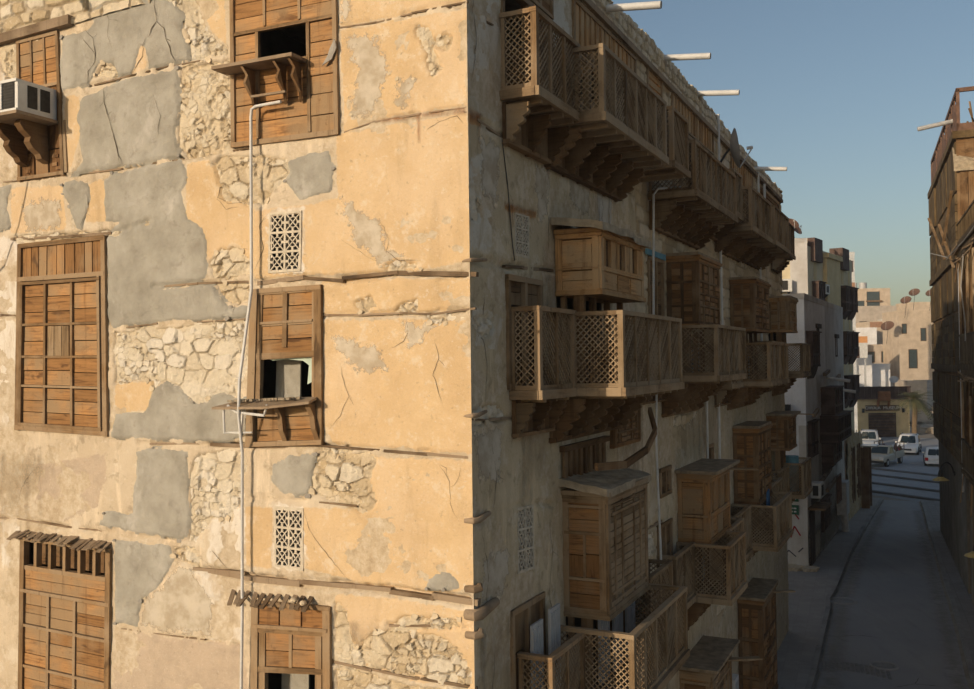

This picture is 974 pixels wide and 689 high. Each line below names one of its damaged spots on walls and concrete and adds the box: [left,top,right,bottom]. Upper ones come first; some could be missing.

crack [133,0,174,72]
spalling [168,0,290,206]
spalling [113,248,250,404]
spalling [169,449,248,568]
spalling [304,448,377,513]
spalling [333,602,472,689]